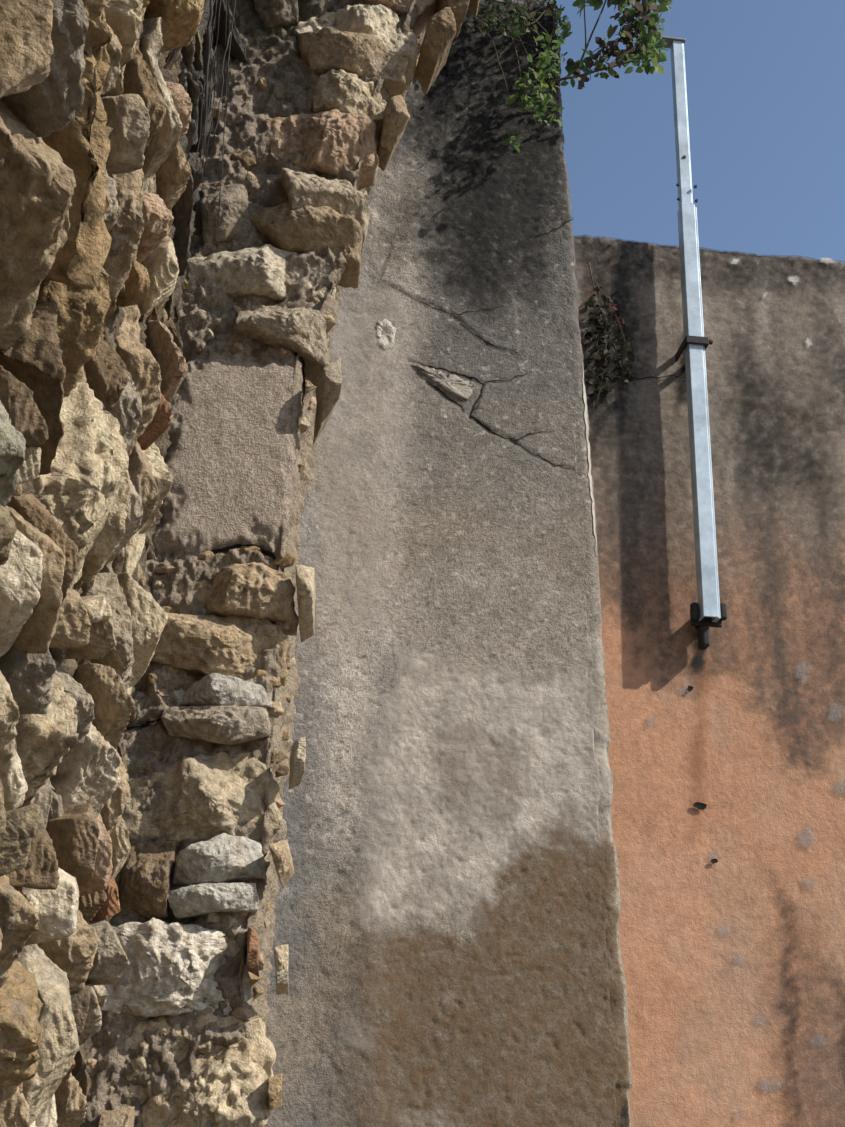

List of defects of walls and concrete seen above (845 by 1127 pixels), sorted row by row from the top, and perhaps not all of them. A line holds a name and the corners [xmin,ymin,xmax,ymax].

water stain [397,0,569,304]
crack [390,285,572,469]
water stain [578,238,738,681]
water stain [711,302,845,765]
water stain [363,651,630,1127]